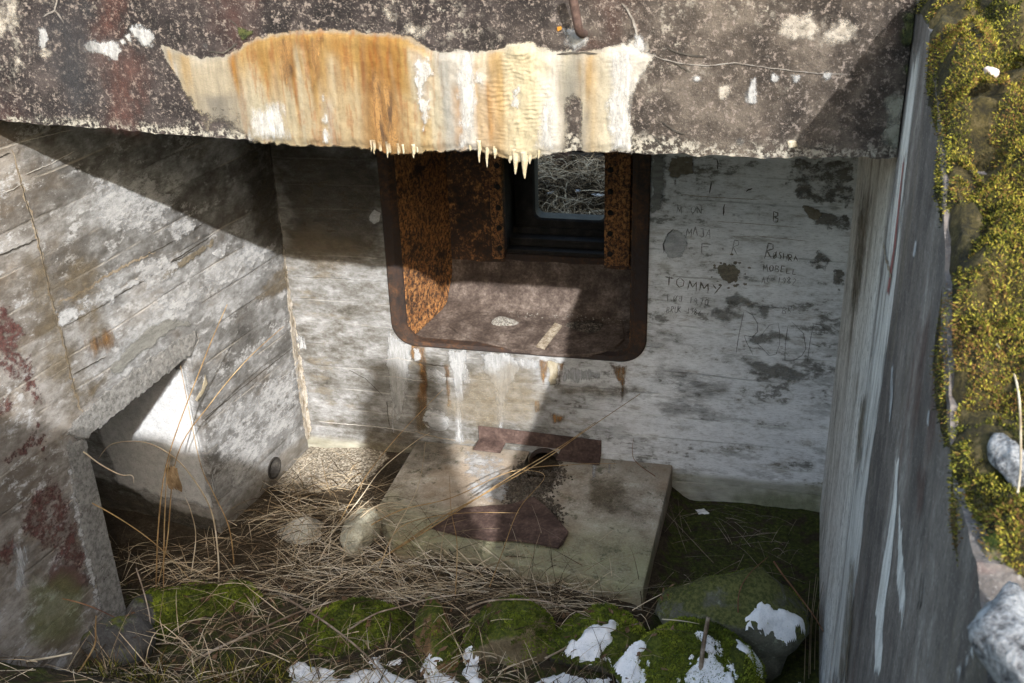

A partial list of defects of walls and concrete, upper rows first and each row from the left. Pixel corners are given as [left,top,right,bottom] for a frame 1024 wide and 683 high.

leakage [711,294,769,321]
leakage [749,331,789,344]
leakage [364,327,414,454]
rust [411,345,428,430]
efflorescence [481,352,547,428]
rust [540,360,564,385]
rust [612,365,625,397]
leakage [747,362,809,381]
leakage [448,350,509,501]